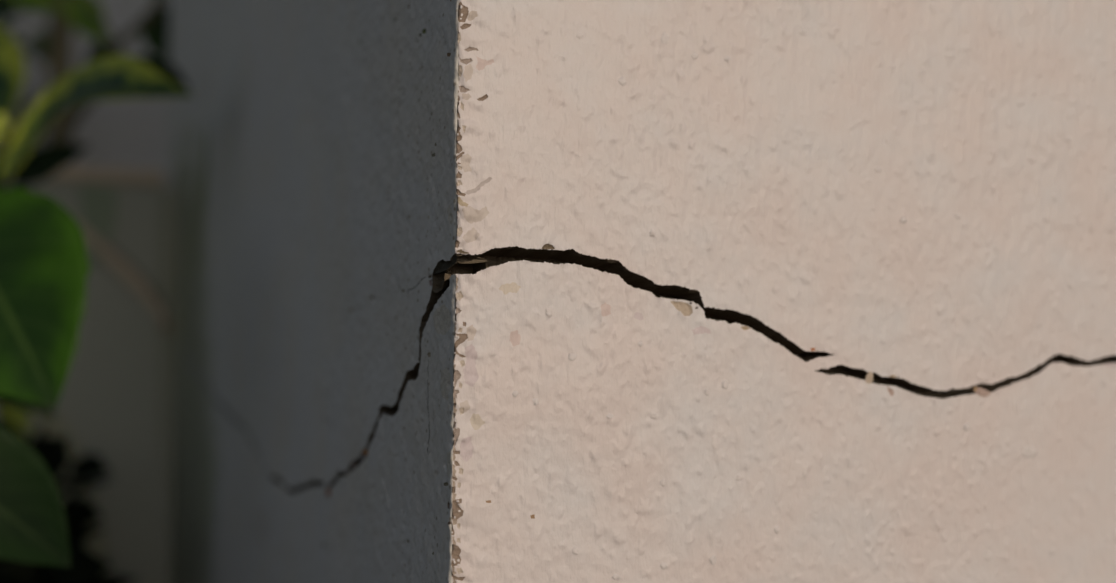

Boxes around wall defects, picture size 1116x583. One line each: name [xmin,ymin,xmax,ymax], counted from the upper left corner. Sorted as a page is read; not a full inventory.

crack [286,246,1116,495]